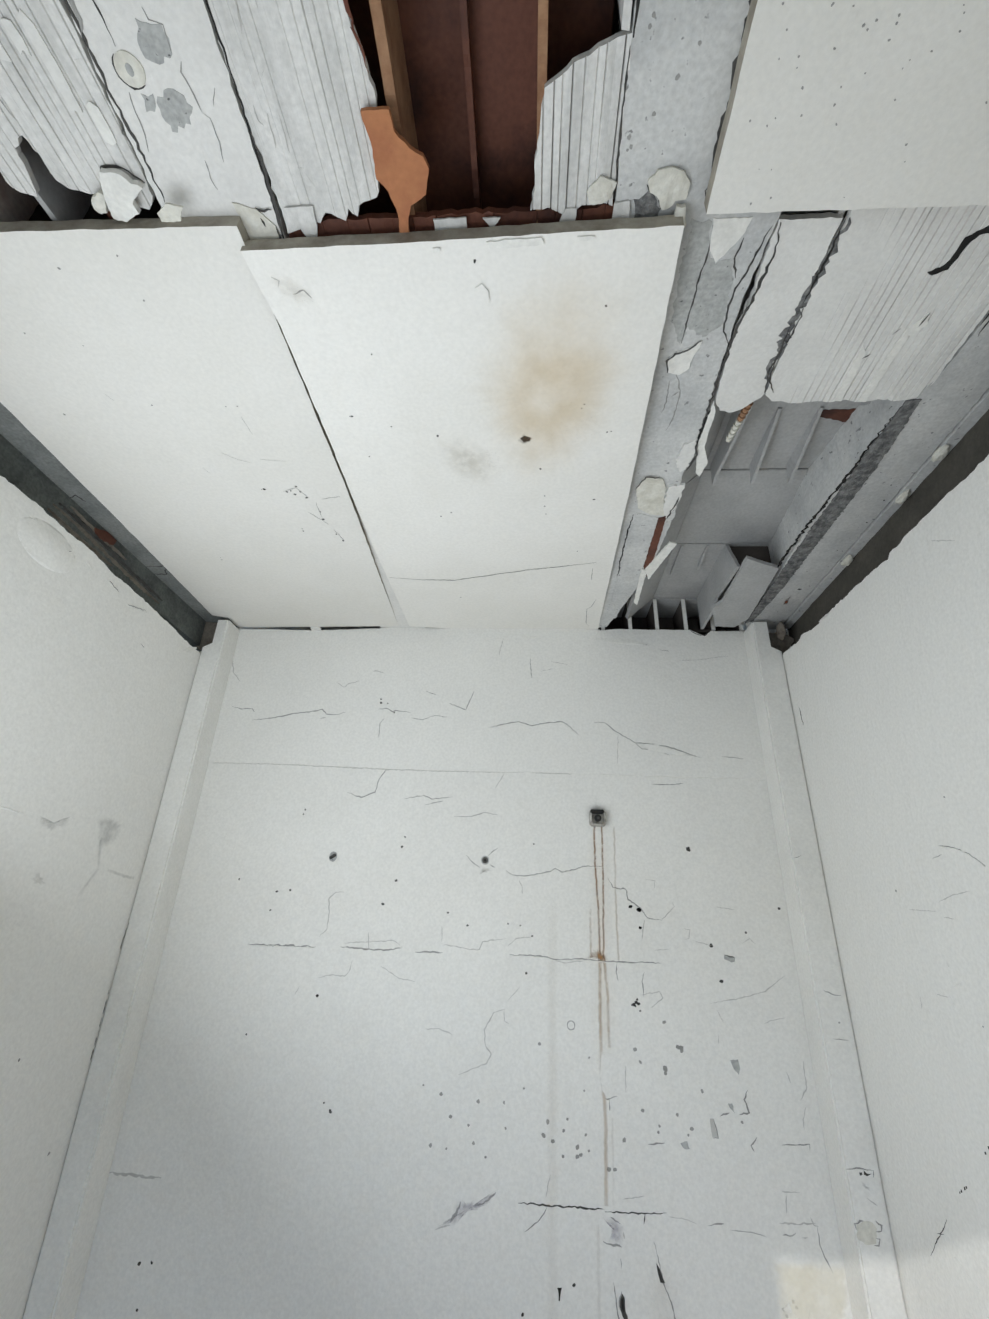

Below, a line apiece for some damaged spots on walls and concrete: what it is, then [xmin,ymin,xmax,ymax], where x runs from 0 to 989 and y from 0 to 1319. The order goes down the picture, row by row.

peeling [141,88,193,133]
flaking render [232,202,318,240]
peeling [360,106,429,233]
peeling [433,217,467,230]
flaking render [560,166,690,241]
spalling [606,401,716,619]
crack [232,662,383,720]
crack [379,691,741,785]
crack [227,763,570,817]
crack [250,865,712,1012]
rust [594,827,605,964]
crack [519,1178,833,1319]